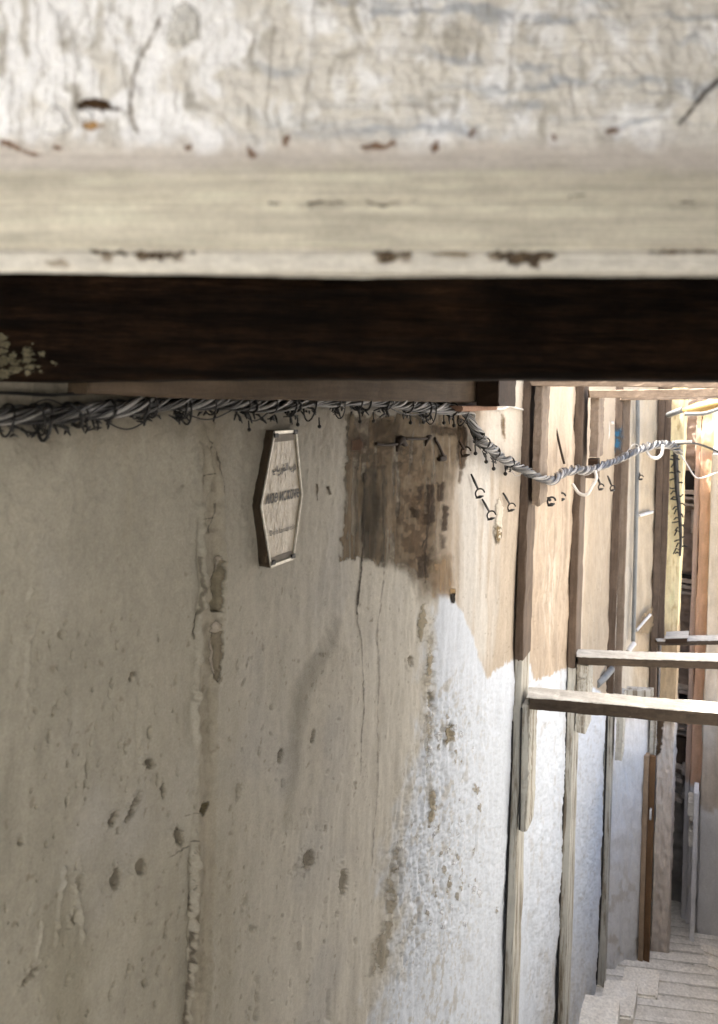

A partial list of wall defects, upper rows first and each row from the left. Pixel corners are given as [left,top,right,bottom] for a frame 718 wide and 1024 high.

spalling [44,98,121,150]
crack [128,17,160,132]
crack [678,79,718,125]
peeling [91,250,195,261]
peeling [487,250,557,269]
flaking render [0,333,56,379]
damp [432,425,467,482]
damp [362,465,386,566]
crack [356,473,366,627]
spalling [209,555,226,682]